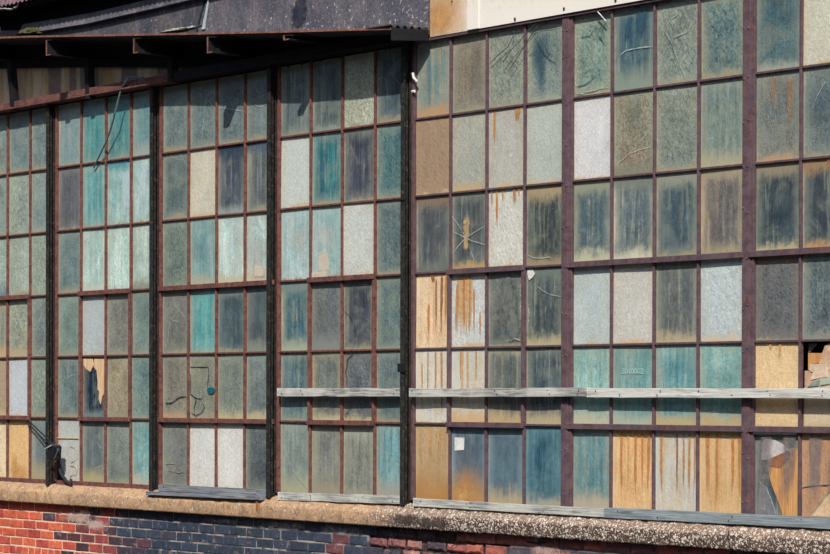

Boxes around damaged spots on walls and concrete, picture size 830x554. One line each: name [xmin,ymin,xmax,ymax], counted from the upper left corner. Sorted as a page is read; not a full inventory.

rust [430,0,458,34]
rust [427,274,481,332]
rust [620,434,650,487]
rust [676,435,696,485]
rust [706,436,718,486]
rust [731,437,741,490]